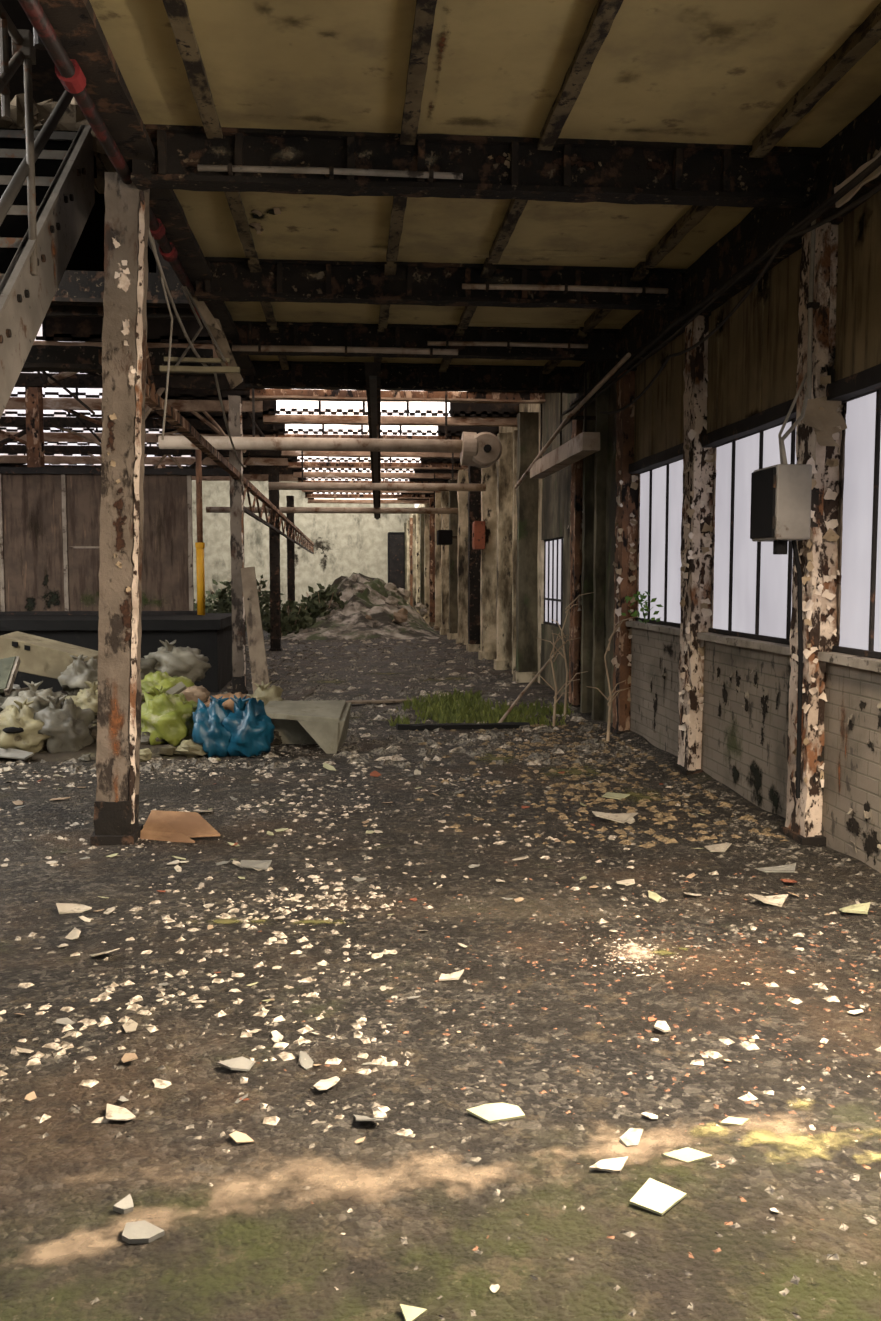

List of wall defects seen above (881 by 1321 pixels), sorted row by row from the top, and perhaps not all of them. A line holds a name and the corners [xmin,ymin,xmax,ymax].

peeling [611,471,639,701]
peeling [650,374,779,746]
peeling [791,346,847,793]
spalling [846,801,881,865]
peeling [847,701,881,751]